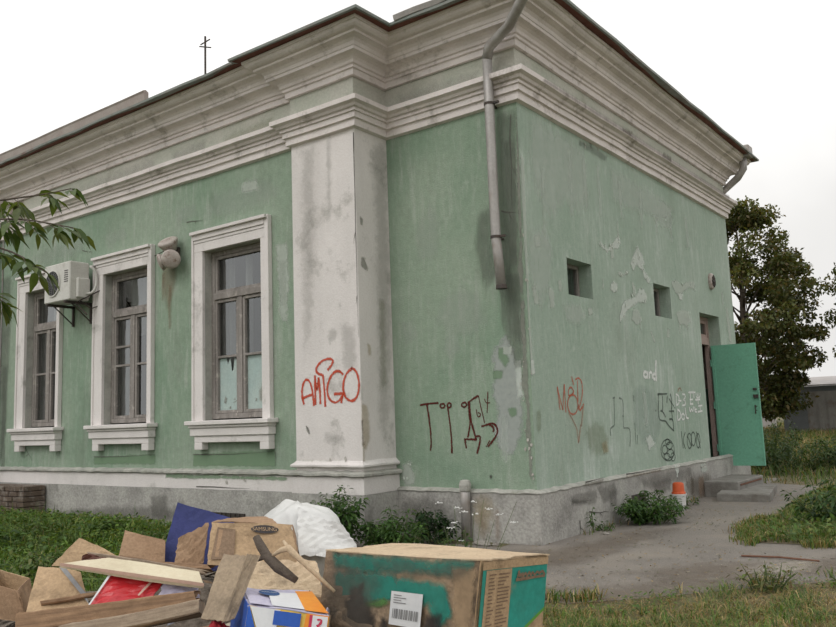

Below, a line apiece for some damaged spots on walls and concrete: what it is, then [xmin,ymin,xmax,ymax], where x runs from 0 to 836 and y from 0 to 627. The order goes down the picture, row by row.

peeling [492,131,540,480]
peeling [620,248,650,324]